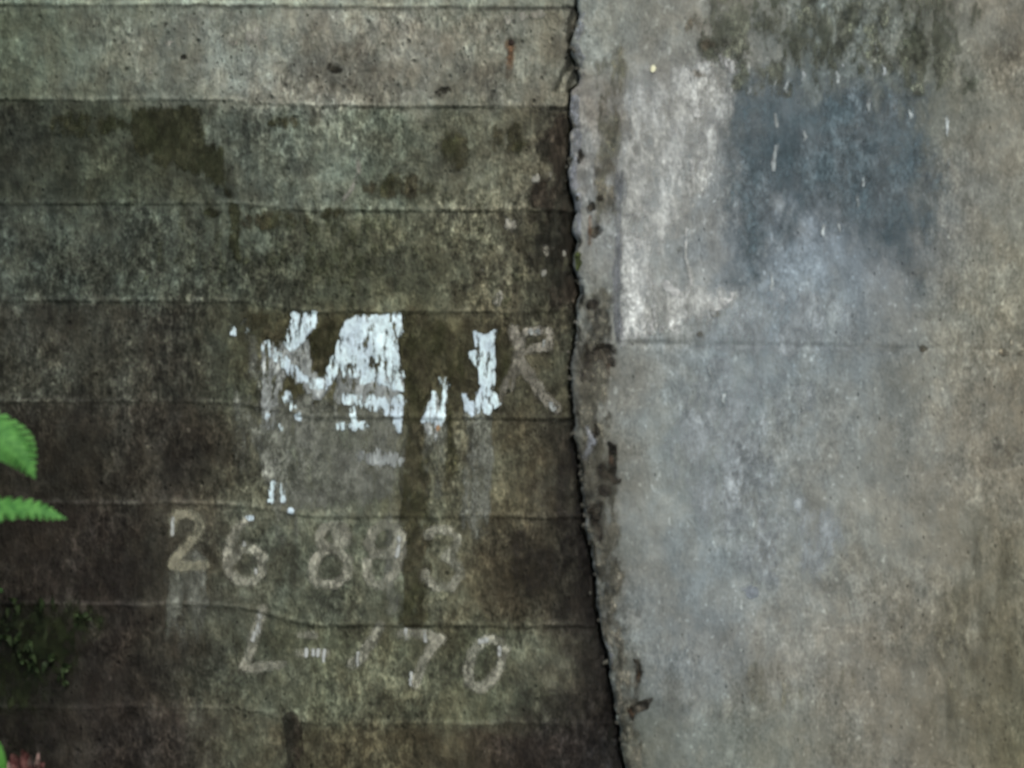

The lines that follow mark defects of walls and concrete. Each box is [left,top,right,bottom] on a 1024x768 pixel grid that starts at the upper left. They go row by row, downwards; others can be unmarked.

damp [686,0,977,277]
peeling [260,338,404,430]
peeling [424,395,440,440]